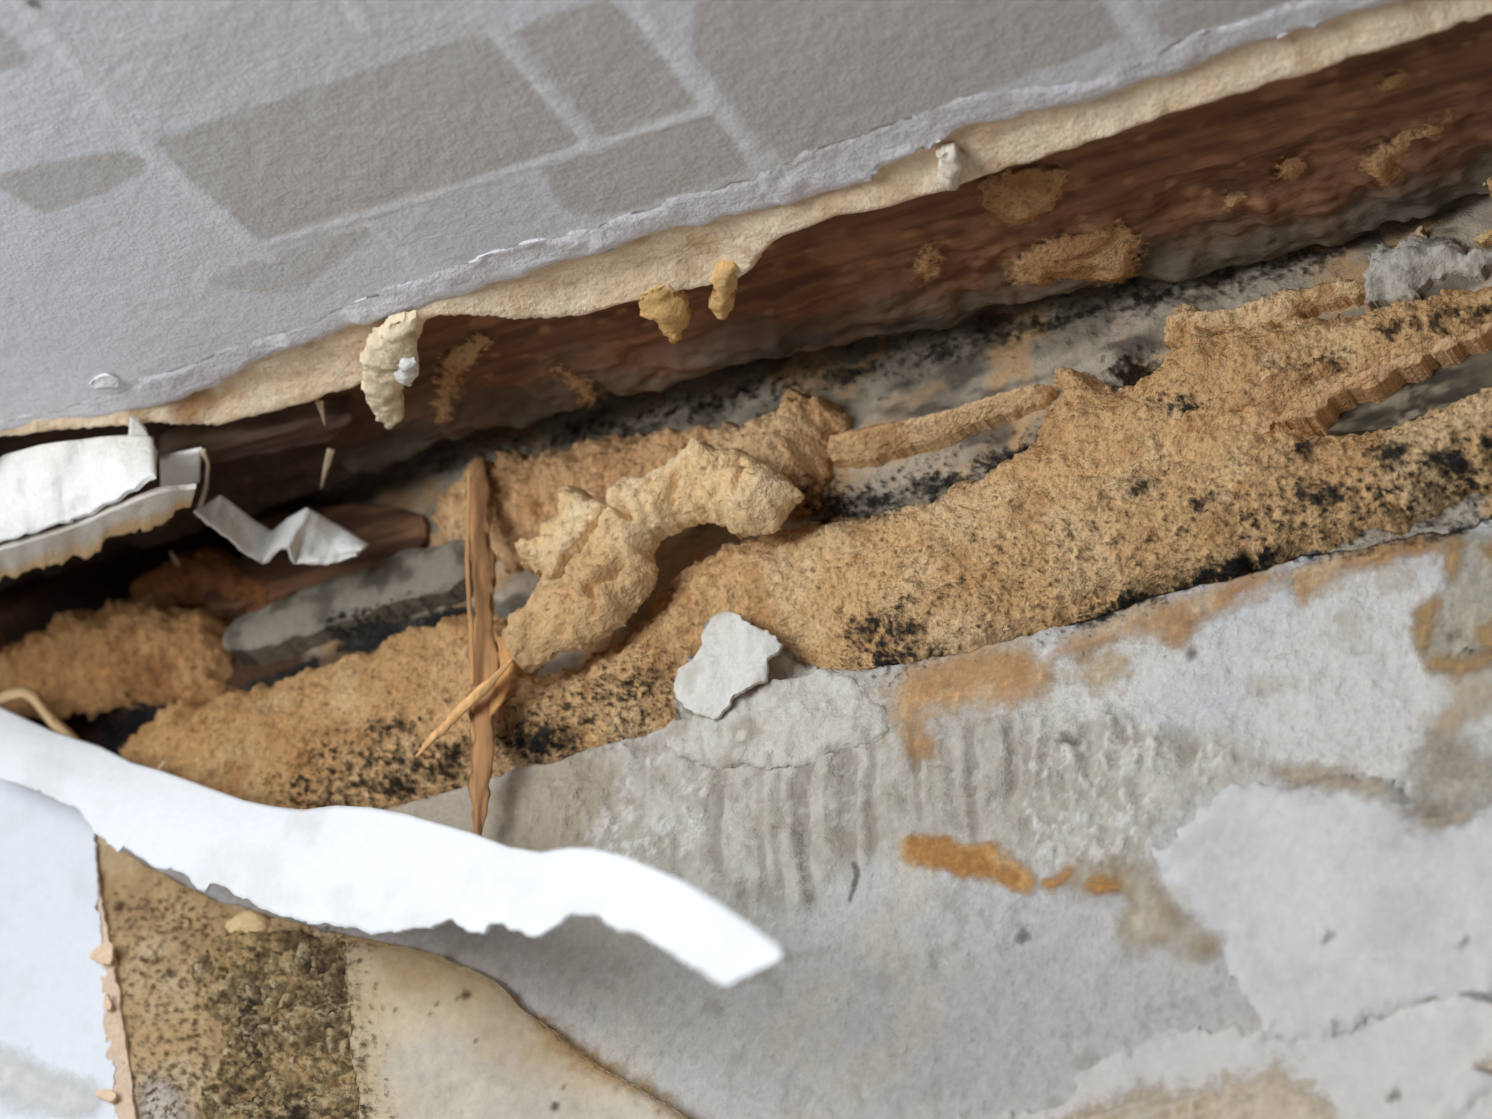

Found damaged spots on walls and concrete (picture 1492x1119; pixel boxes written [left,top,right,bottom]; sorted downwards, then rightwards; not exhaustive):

flaking render [415,0,1492,340]
flaking render [0,318,388,437]
leakage [419,244,1354,476]
leakage [84,691,166,756]
leakage [257,702,472,809]
leakage [319,590,475,654]
leakage [493,644,680,764]
flaking render [664,611,891,771]
leakage [801,411,1492,828]
leakage [106,877,395,1119]
peeling [0,707,786,1119]
peeling [956,773,1492,1119]